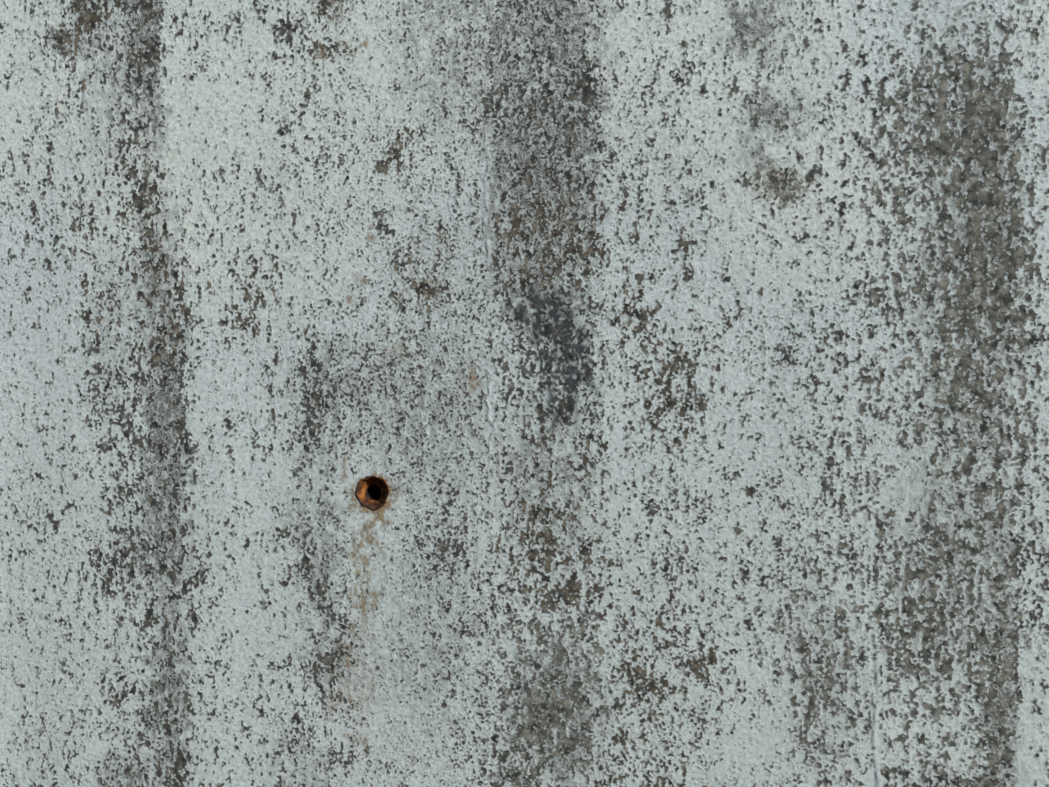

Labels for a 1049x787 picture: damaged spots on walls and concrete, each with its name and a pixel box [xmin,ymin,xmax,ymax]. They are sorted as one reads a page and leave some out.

damp [120,0,164,150]
damp [483,0,609,430]
damp [952,195,1015,326]
damp [123,218,192,581]
corrosion [338,473,398,668]
damp [114,602,191,787]
damp [509,639,596,779]
damp [979,582,1017,787]